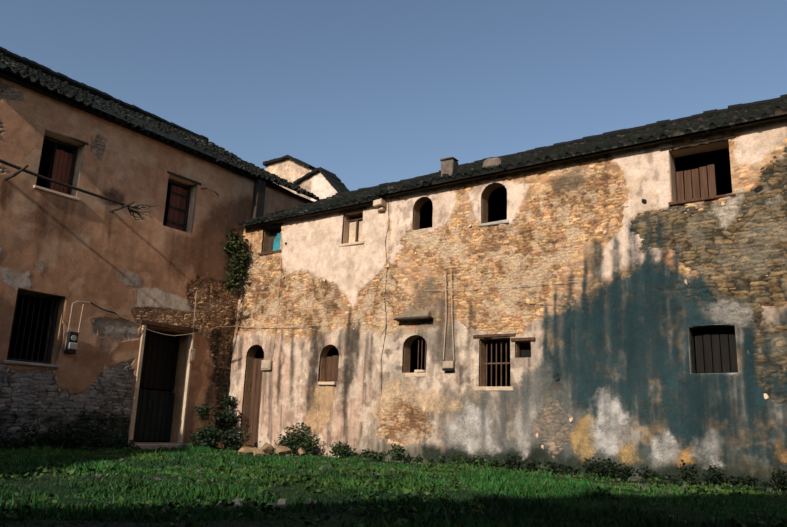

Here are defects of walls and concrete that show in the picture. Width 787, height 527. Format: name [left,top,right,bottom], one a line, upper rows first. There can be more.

flaking render [400,146,787,407]
flaking render [0,359,135,450]
flaking render [92,251,342,433]
damp [306,327,322,412]
damp [341,311,360,416]